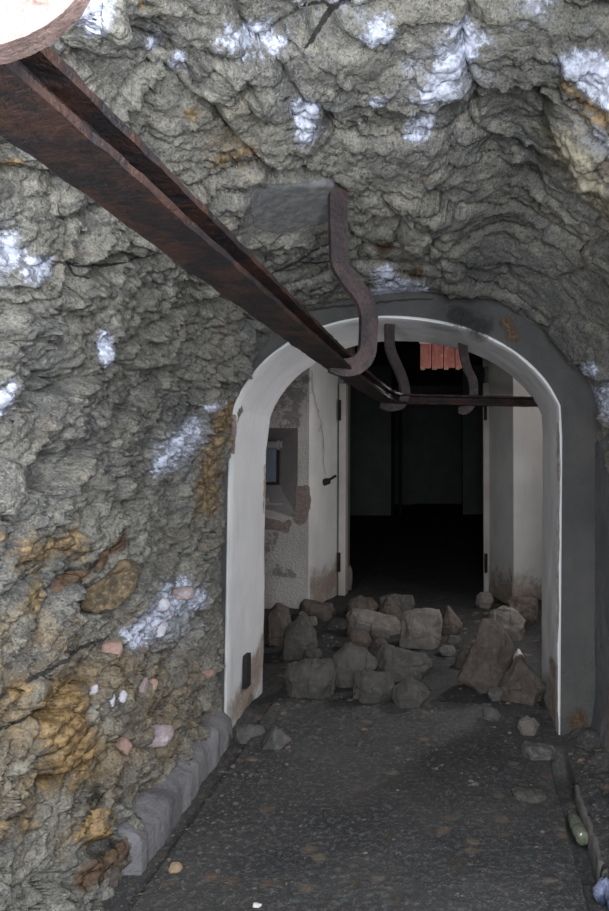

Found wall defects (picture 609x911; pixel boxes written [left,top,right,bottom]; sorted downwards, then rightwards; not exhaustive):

water stain [76,0,115,35]
water stain [146,34,160,50]
water stain [170,50,185,68]
water stain [216,20,288,60]
water stain [360,13,398,48]
water stain [404,15,489,142]
water stain [554,47,609,132]
water stain [290,96,321,146]
water stain [535,122,609,232]
water stain [0,382,17,416]
water stain [581,362,609,425]
water stain [119,575,207,650]